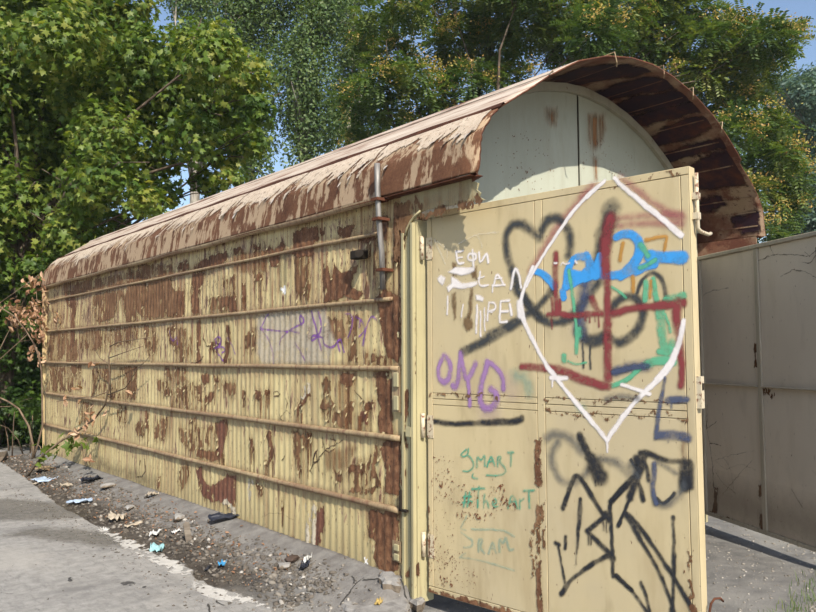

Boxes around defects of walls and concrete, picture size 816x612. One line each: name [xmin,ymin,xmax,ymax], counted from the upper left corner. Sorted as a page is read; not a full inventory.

corrosion [549,64,749,214]
peeling [49,110,490,267]
corrosion [730,209,761,234]
peeling [346,313,387,371]
peeling [80,366,137,423]
peeling [157,326,215,455]
peeling [293,431,307,478]
peeling [349,444,382,494]
corrosion [534,437,543,487]
corrosion [367,456,516,612]
corrosion [529,503,546,612]
corrosion [684,550,697,612]